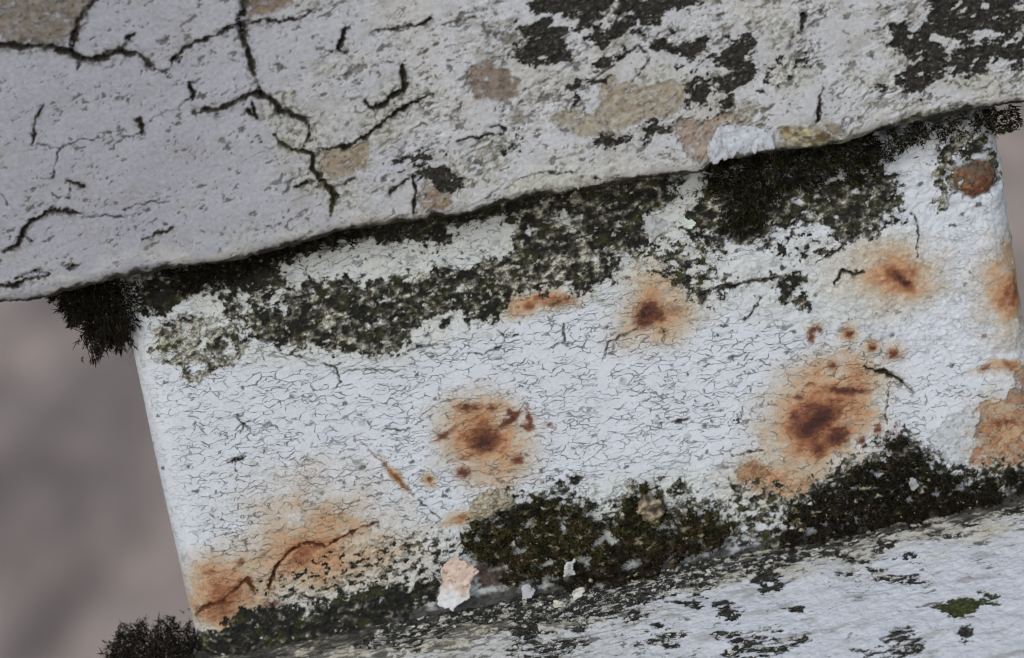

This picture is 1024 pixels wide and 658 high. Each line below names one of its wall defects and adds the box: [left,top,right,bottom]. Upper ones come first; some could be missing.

crack [0,0,434,217]
crack [331,13,487,56]
spalling [467,60,520,102]
spalling [551,76,845,164]
crack [3,105,174,253]
crack [0,263,80,290]
corrosion [617,271,695,346]
corrosion [854,241,939,306]
corrosion [436,396,533,489]
corrosion [737,324,901,499]
crack [195,521,379,615]
corrosion [187,493,401,632]